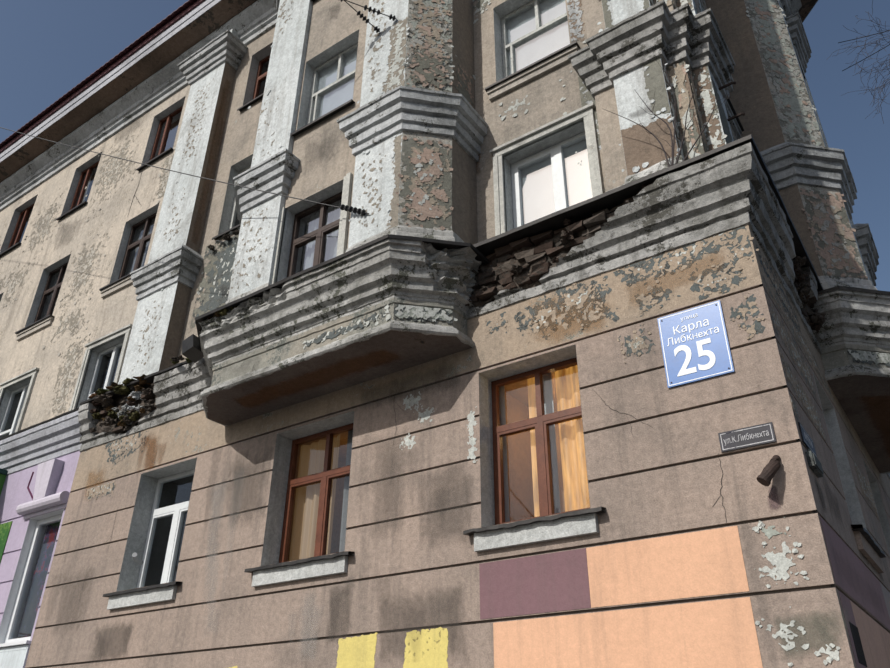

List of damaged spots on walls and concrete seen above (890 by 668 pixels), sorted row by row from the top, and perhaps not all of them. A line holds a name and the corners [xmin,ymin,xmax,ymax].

peeling [367,0,475,107]
flaking render [619,57,737,176]
peeling [746,0,825,147]
peeling [349,131,454,231]
peeling [800,188,868,280]
peeling [302,304,458,349]
spalling [465,182,829,446]
spalling [85,382,157,502]
peeling [400,433,418,450]
peeling [467,406,478,463]
peeling [752,517,809,588]
peeling [755,618,840,665]